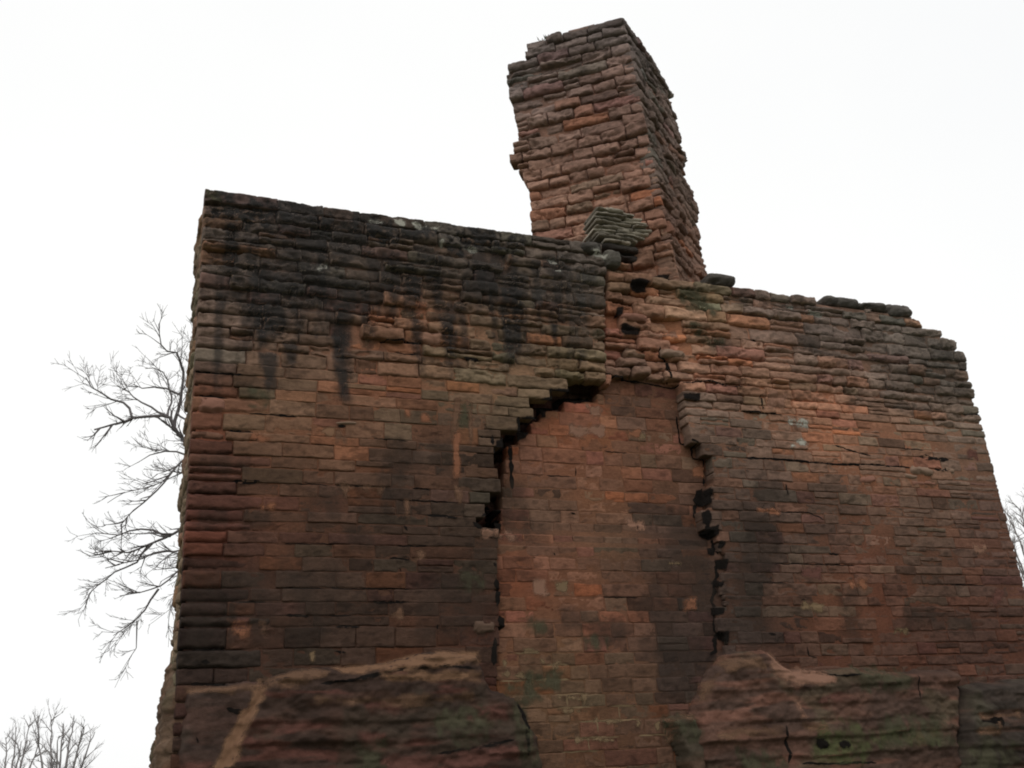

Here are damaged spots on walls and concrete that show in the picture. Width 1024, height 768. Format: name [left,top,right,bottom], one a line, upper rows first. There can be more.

damp [210,190,526,395]
crack [676,416,719,655]